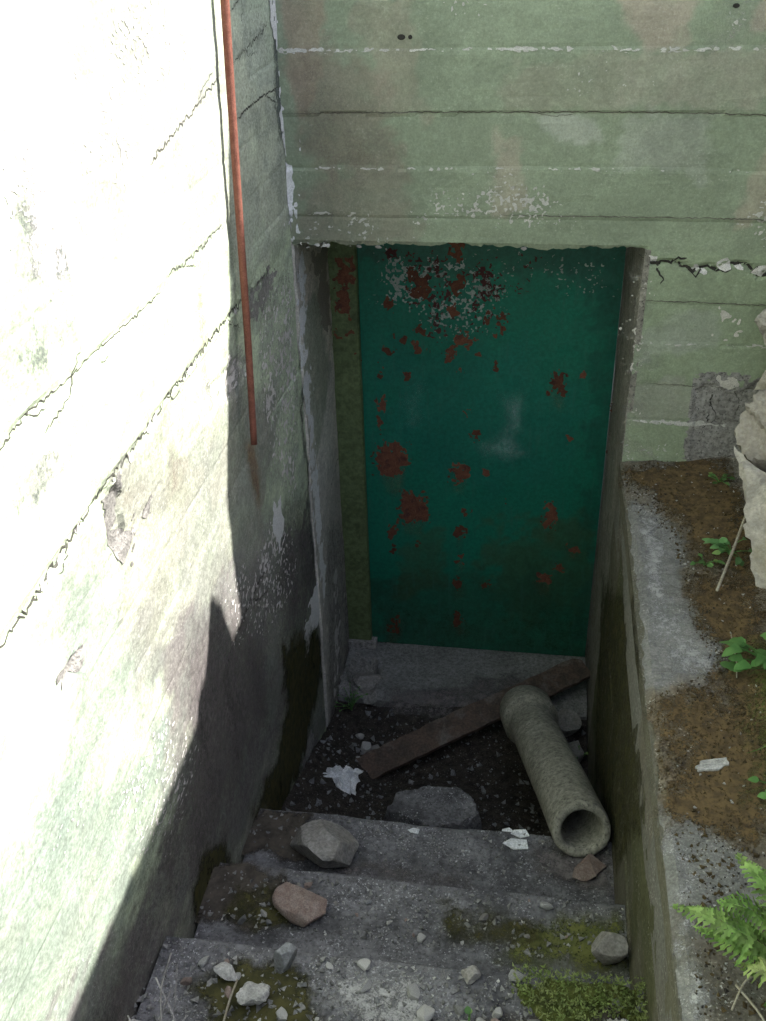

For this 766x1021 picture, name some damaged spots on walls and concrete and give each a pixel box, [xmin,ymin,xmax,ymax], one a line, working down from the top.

corrosion [403,266,432,303]
corrosion [443,242,469,317]
crack [639,254,766,306]
crack [0,224,223,451]
peeling [206,343,246,406]
corrosion [377,324,432,379]
corrosion [444,329,499,373]
corrosion [546,369,568,397]
peeling [621,372,761,462]
crack [0,286,251,659]
corrosion [370,394,431,554]
spalling [102,471,154,566]